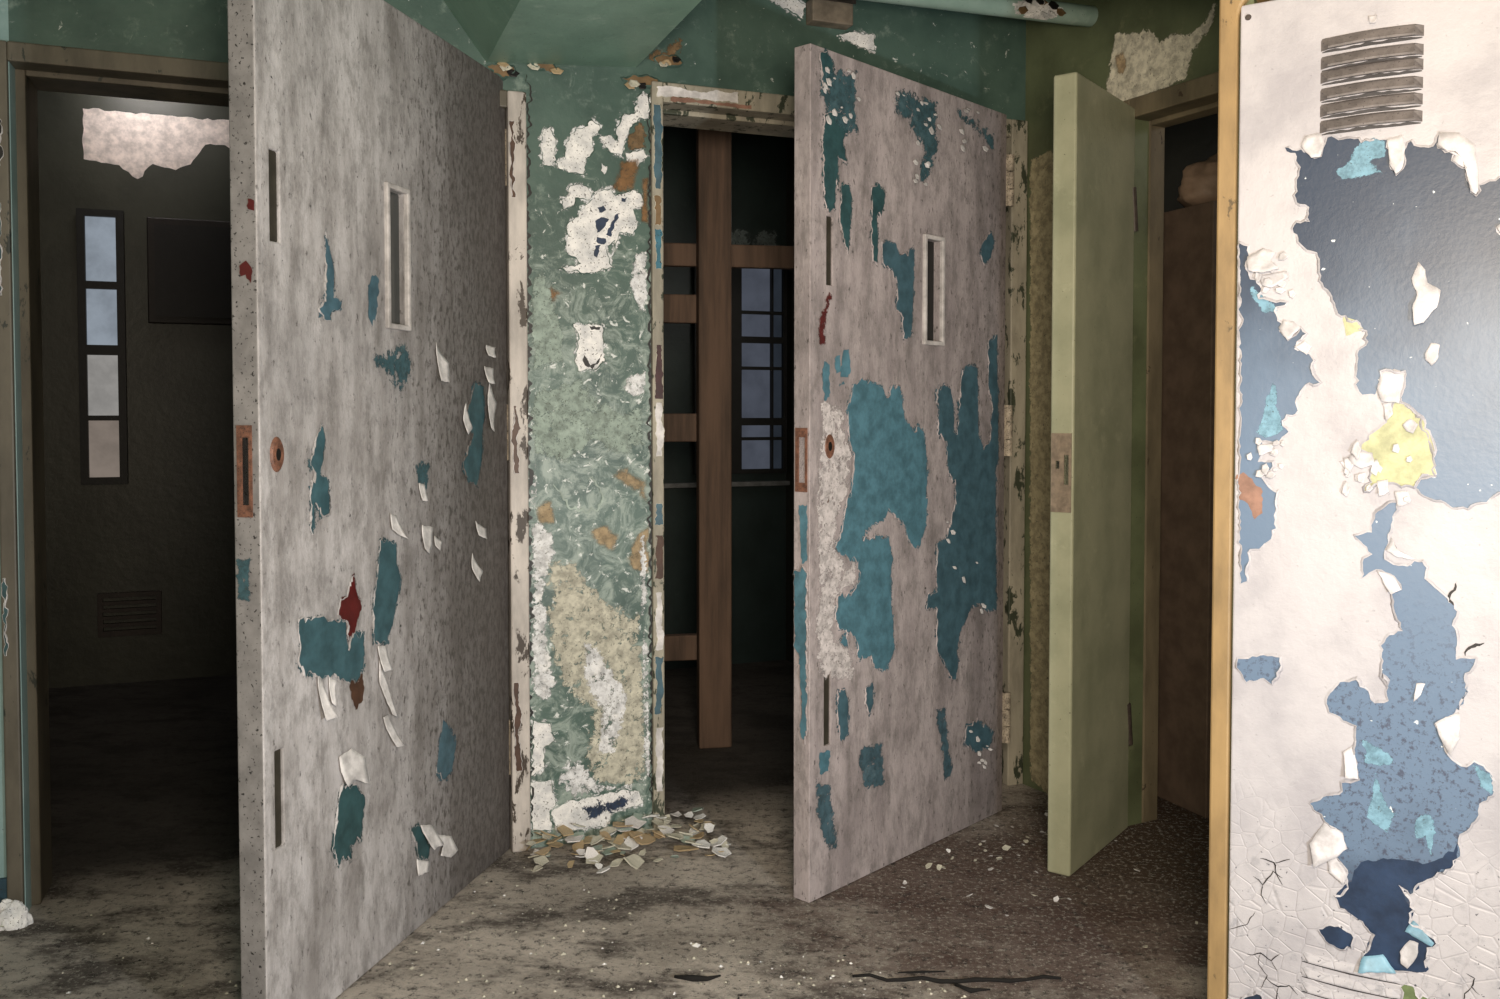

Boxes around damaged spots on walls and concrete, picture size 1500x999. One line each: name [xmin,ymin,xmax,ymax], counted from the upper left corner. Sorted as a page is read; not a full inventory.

peeling [573,320,607,372]
peeling [537,38,738,310]
peeling [624,345,665,457]
peeling [819,30,876,90]
peeling [820,110,915,341]
peeling [979,231,996,265]
peeling [1106,4,1216,101]
peeling [513,503,664,833]
peeling [793,333,1000,850]
peeling [1232,131,1500,999]